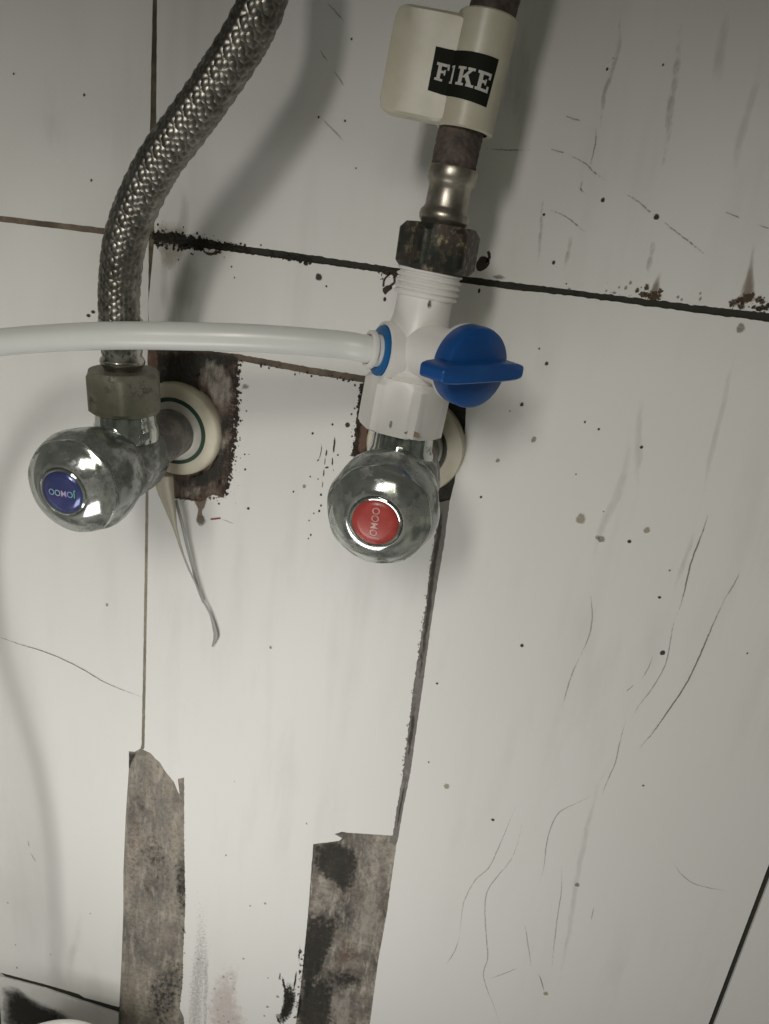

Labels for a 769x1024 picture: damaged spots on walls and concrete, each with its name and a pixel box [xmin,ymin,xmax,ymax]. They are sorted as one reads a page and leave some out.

leakage [151,221,251,260]
leakage [269,251,312,265]
leakage [377,268,398,301]
leakage [476,251,503,279]
leakage [194,500,220,524]
crack [14,642,122,690]
crack [656,616,717,728]
peeling [119,750,186,1024]
peeling [293,832,396,1024]